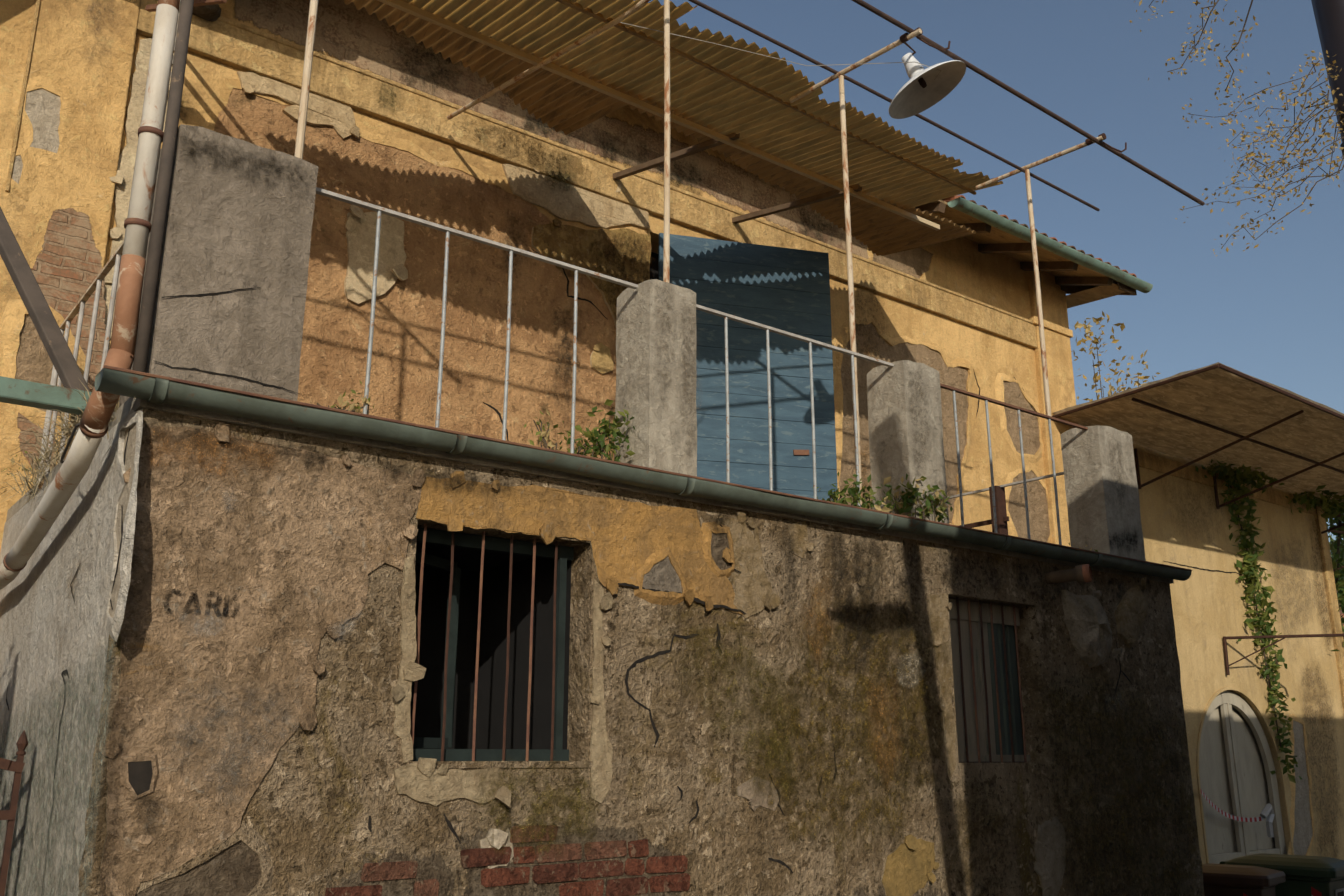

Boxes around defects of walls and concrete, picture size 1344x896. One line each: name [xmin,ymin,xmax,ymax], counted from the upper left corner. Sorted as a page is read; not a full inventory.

flaking render [0,299,64,387]
flaking render [7,403,78,471]
flaking render [31,38,152,389]
crack [162,287,260,298]
crack [153,360,302,395]
flaking render [200,71,651,461]
flaking render [234,0,937,282]
flaking render [834,315,975,525]
flaking render [995,373,1051,543]
peeling [97,410,780,896]
crack [618,583,746,747]
leakage [698,536,946,847]